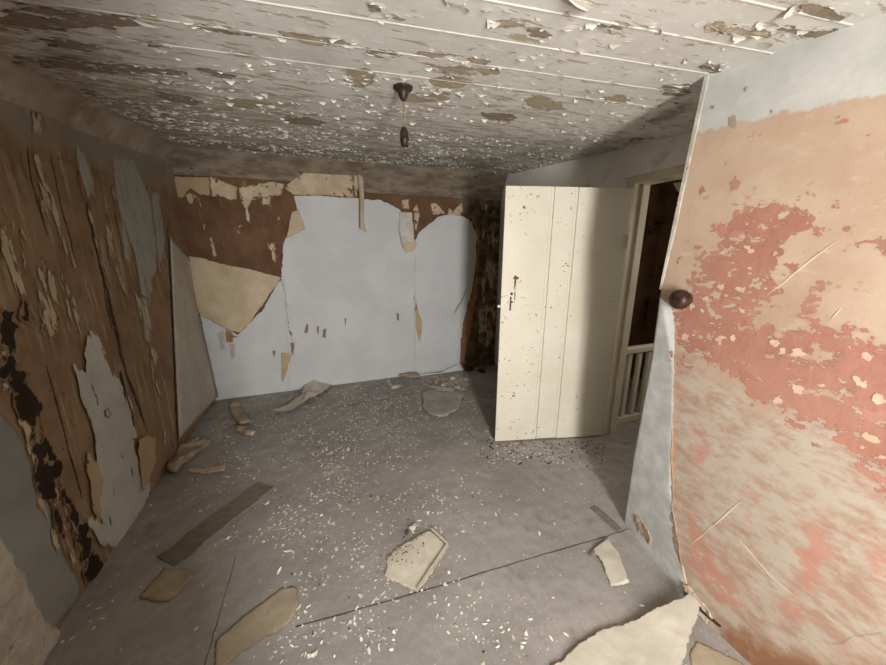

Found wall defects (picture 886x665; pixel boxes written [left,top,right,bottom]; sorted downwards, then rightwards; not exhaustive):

peeling [0,0,693,174]
peeling [659,35,731,74]
peeling [691,1,852,50]
peeling [460,215,480,364]
peeling [668,176,886,498]
mould [0,298,108,584]
flaking render [0,412,82,665]